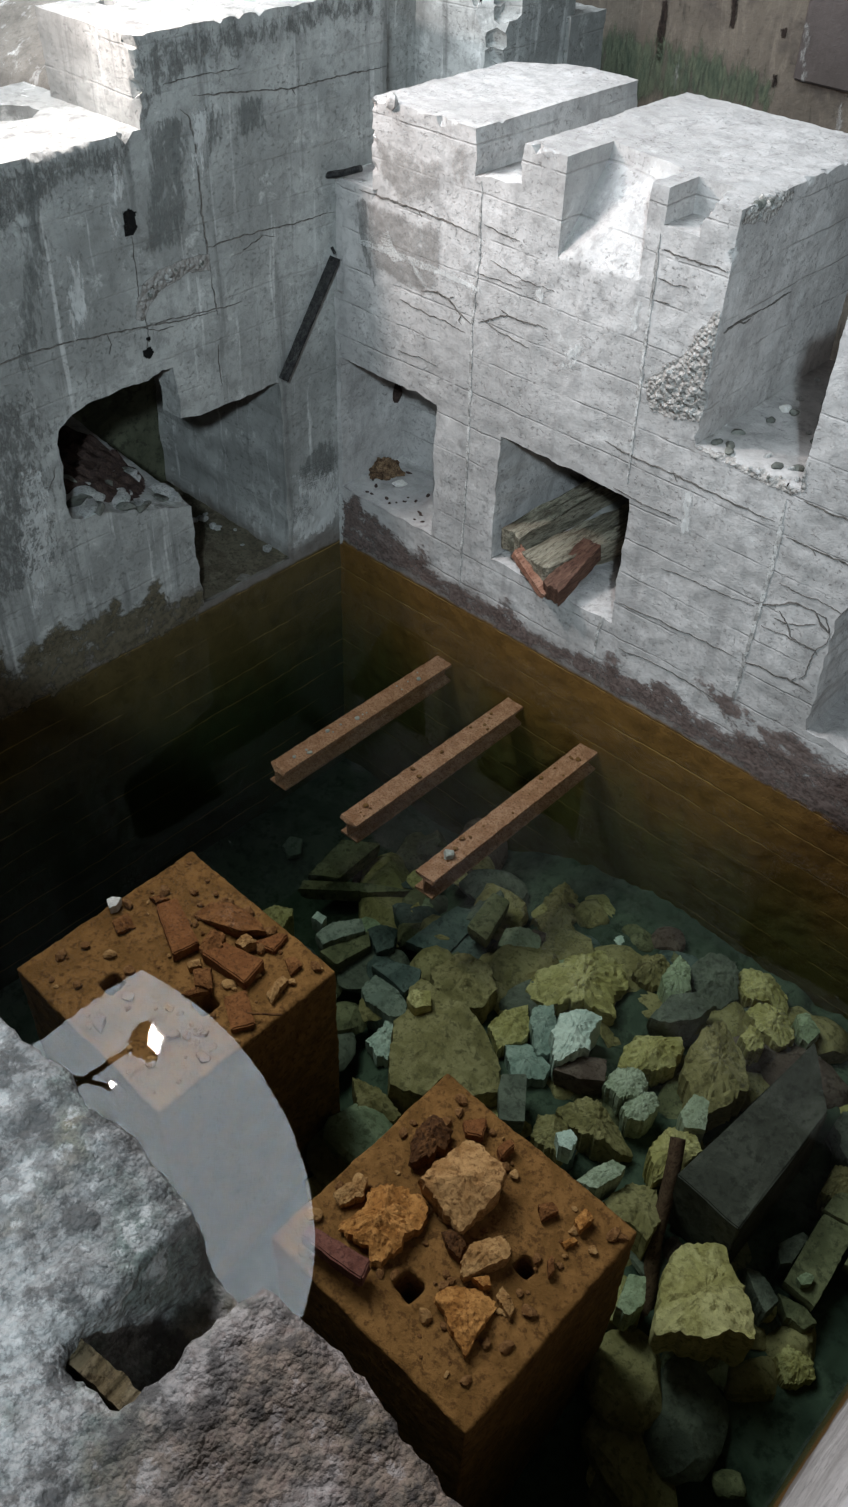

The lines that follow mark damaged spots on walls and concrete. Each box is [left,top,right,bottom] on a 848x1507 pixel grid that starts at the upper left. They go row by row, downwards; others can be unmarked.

spalling [136,254,210,359]
spalling [645,311,721,422]
crack [606,441,848,566]
leakage [293,472,848,833]
crack [618,568,841,698]